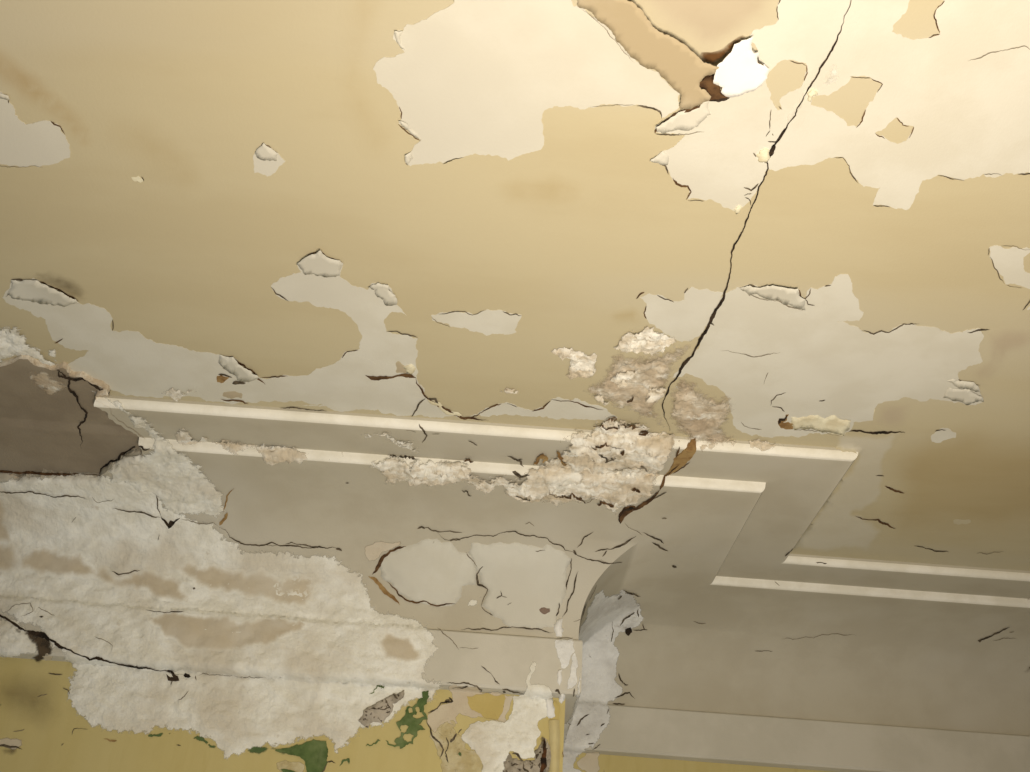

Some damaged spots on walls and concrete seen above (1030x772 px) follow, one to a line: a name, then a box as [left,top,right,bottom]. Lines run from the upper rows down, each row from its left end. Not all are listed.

peeling [0,92,71,168]
peeling [373,0,1030,211]
peeling [0,250,457,478]
crack [418,2,851,771]
peeling [364,274,988,553]
leakage [852,399,1030,550]
leakage [965,324,1030,389]
crack [0,603,266,700]
flaking render [0,495,316,652]
spalling [358,690,404,728]
flaking render [427,662,555,772]
crack [978,628,1016,642]